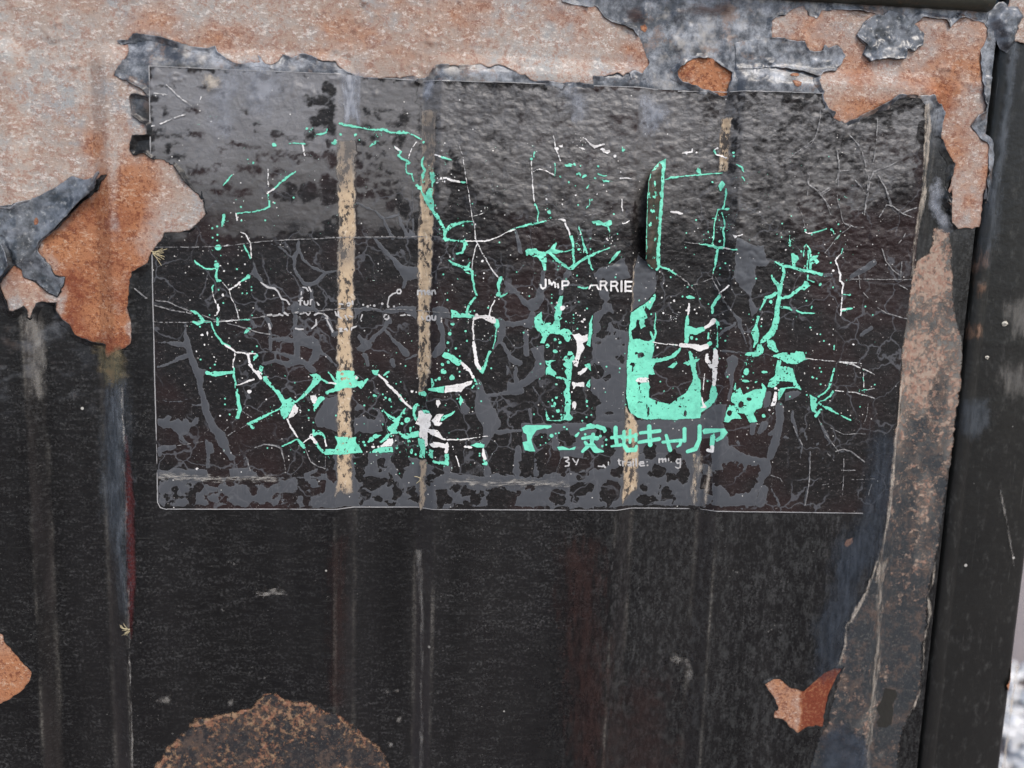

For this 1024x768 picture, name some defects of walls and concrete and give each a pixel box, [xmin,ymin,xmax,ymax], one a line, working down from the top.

peeling [735,38,846,76]
peeling [857,10,924,62]
peeling [0,171,99,297]
rust [0,0,654,385]
crack [459,146,500,279]
peeling [645,159,666,271]
crack [785,108,917,319]
crack [134,282,362,335]
crack [793,358,875,506]
rust [761,3,994,768]
rust [0,629,36,708]
rust [155,693,389,768]